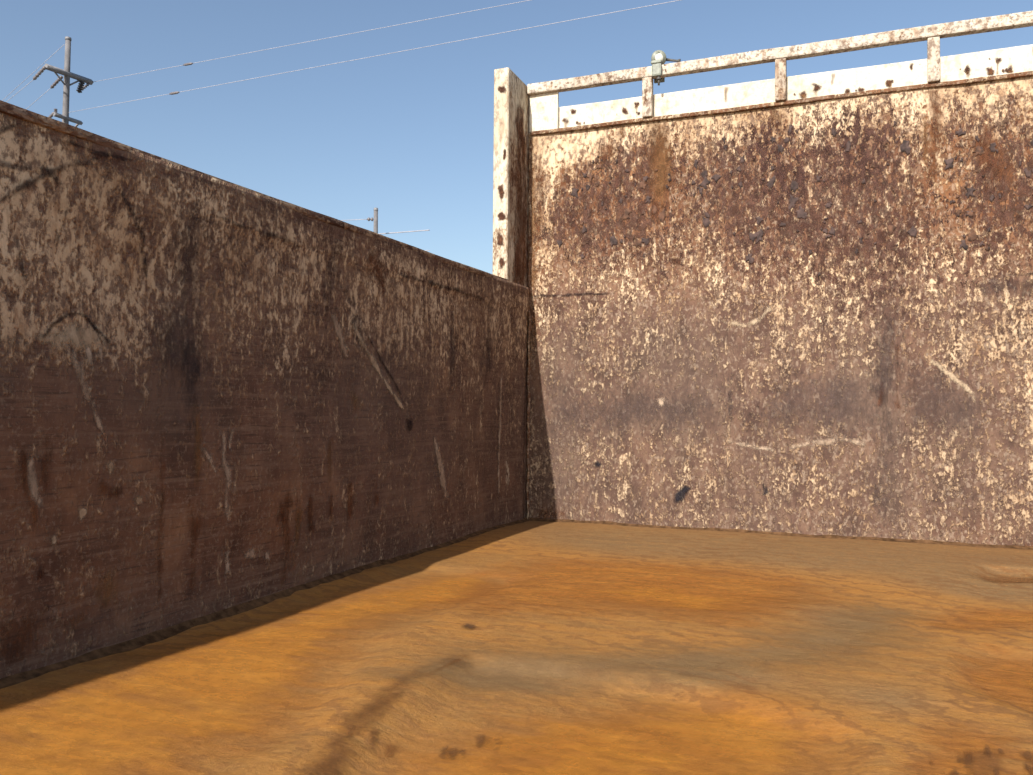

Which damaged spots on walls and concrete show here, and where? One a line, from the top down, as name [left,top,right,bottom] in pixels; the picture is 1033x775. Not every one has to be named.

corrosion [986,58,1013,75]
corrosion [498,80,1033,322]
peeling [40,324,105,367]